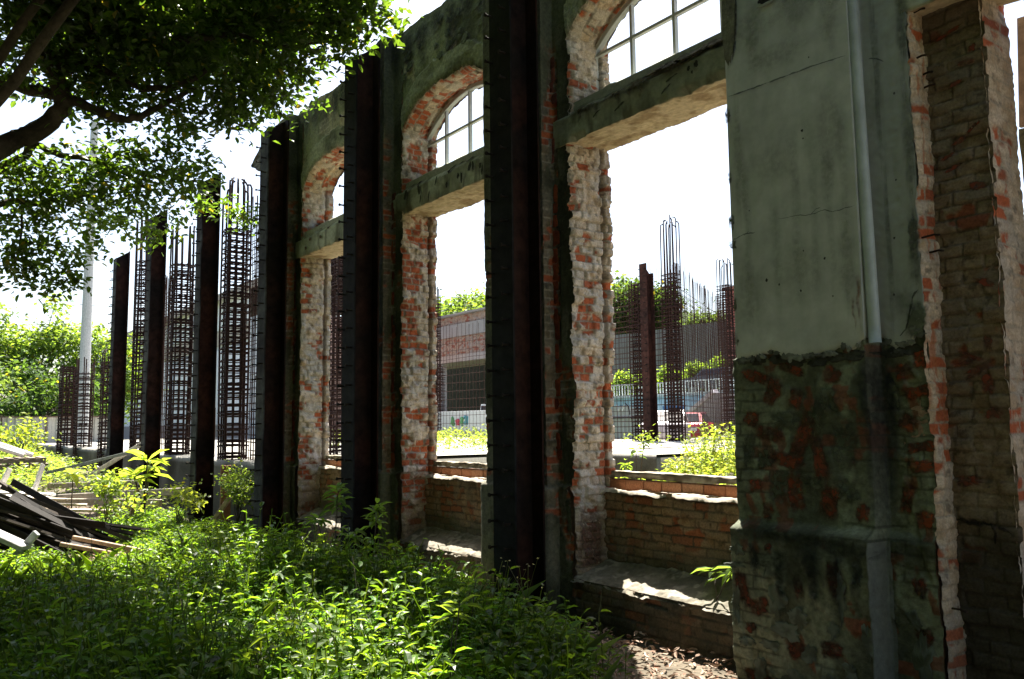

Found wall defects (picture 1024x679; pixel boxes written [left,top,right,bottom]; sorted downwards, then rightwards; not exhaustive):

crack [728,56,843,97]
flaking render [908,219,920,251]
flaking render [734,290,935,529]
spalling [735,572,768,633]